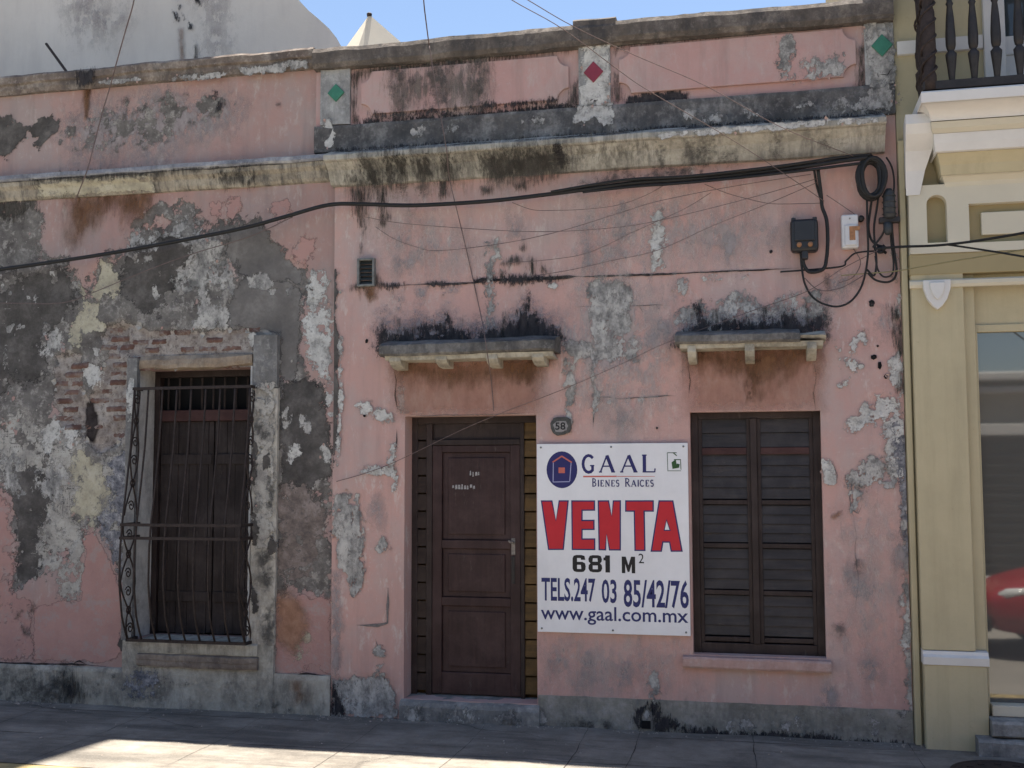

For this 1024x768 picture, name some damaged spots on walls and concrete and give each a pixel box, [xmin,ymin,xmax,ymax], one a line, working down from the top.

leakage [0,89,235,161]
leakage [351,53,579,124]
leakage [334,112,882,226]
peeling [658,22,902,140]
peeling [0,175,402,644]
leakage [351,276,405,299]
leakage [372,237,566,357]
peeling [561,277,642,434]
peeling [647,207,668,272]
leakage [670,278,830,349]
peeling [820,350,913,711]
peeling [331,645,398,719]